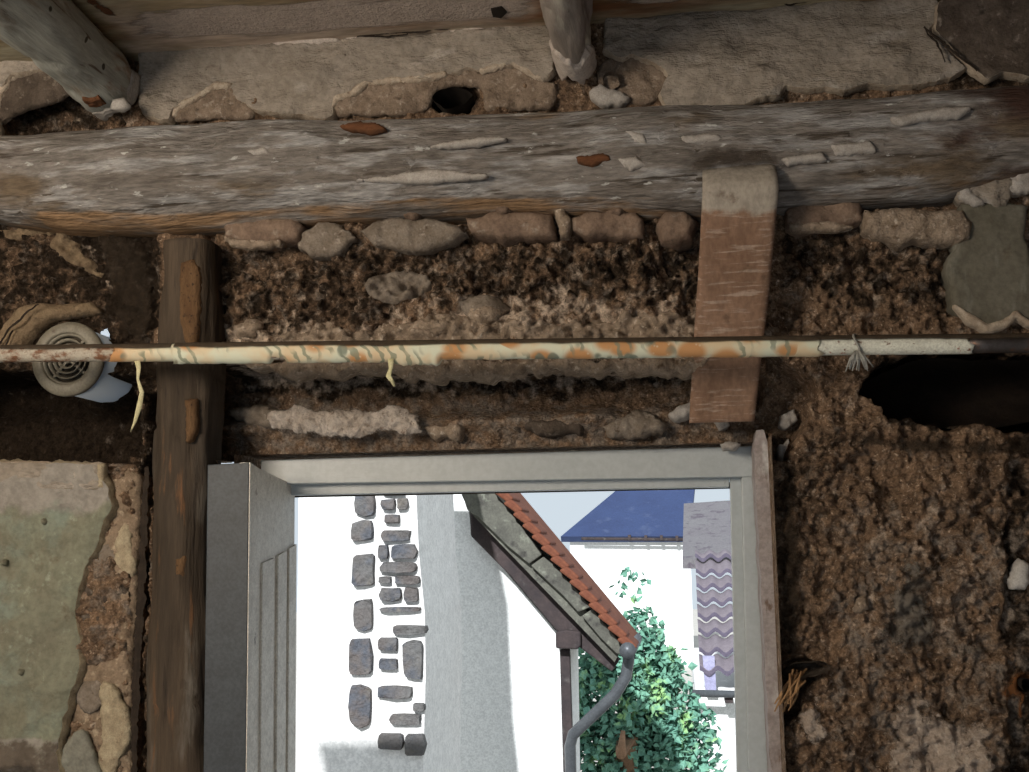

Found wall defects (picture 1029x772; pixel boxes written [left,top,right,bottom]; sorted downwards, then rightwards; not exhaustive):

peeling [260,37,357,45]
spalling [0,69,70,135]
spalling [139,62,558,125]
spalling [859,358,1029,431]
spalling [56,468,144,772]